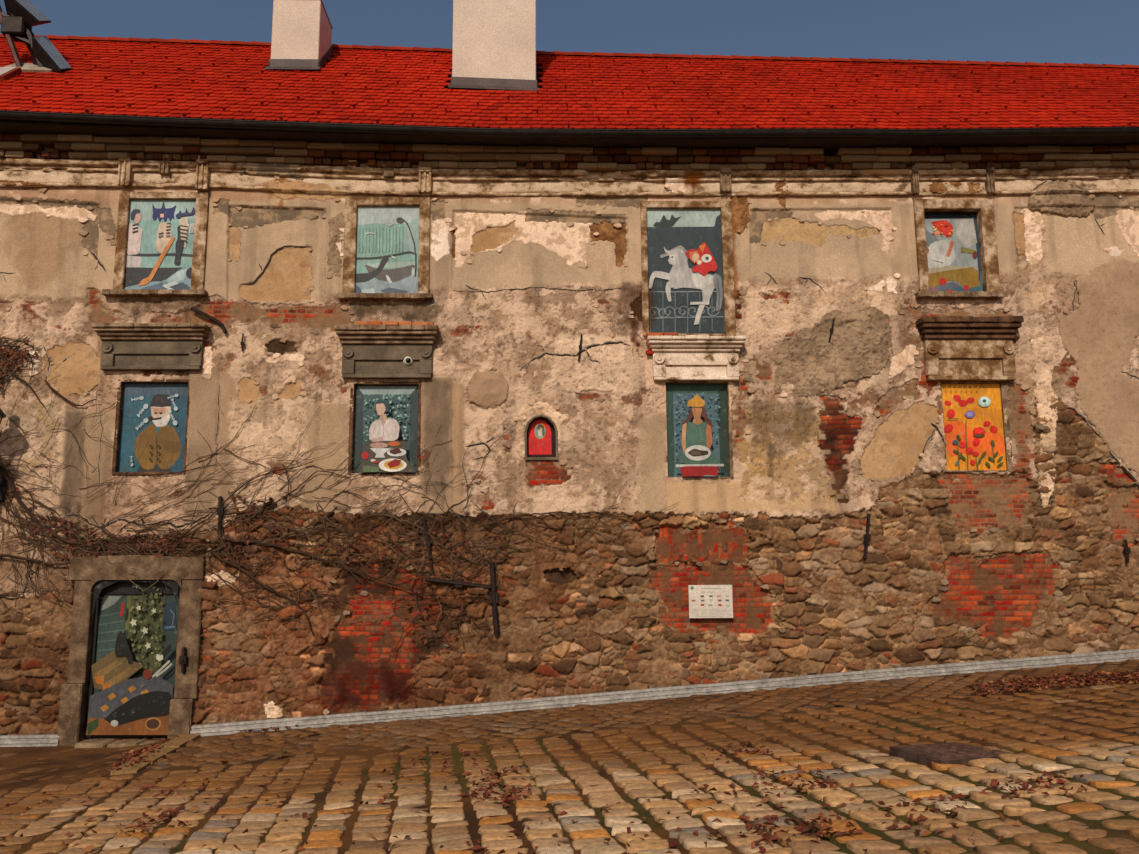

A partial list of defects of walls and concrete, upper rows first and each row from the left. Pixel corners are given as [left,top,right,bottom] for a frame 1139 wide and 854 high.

peeling [0,180,117,260]
flaking render [84,162,355,403]
crack [240,245,311,285]
peeling [430,187,648,268]
flaking render [628,296,642,321]
flaking render [735,287,794,327]
flaking render [731,178,897,254]
peeling [863,273,900,294]
flaking render [23,342,101,396]
crack [520,341,631,371]
flaking render [76,304,1139,726]
flaking render [0,582,75,735]